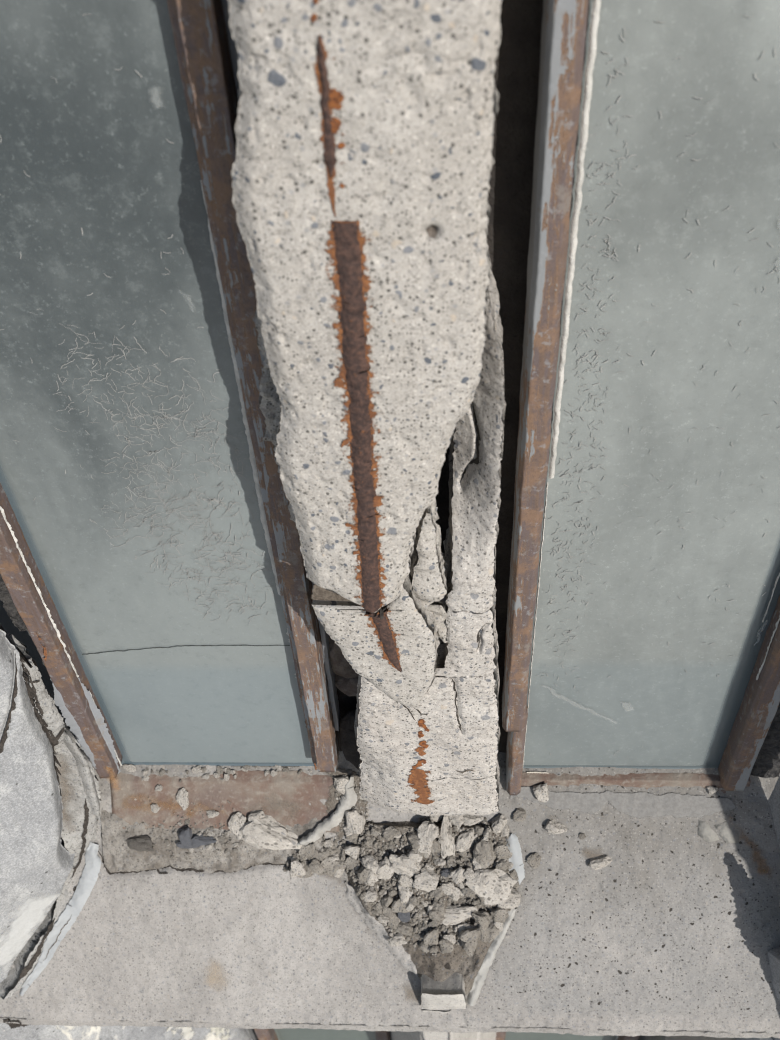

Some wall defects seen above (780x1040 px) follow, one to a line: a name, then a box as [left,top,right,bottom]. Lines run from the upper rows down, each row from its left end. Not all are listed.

rust [312,34,345,217]
spalling [255,308,281,473]
spalling [324,220,402,672]
crack [311,584,387,619]
spalling [409,495,449,607]
crack [0,647,64,785]
peeling [297,774,357,846]
rust [406,720,435,805]
crack [451,678,462,733]
crack [18,798,286,982]
spalling [346,821,508,995]